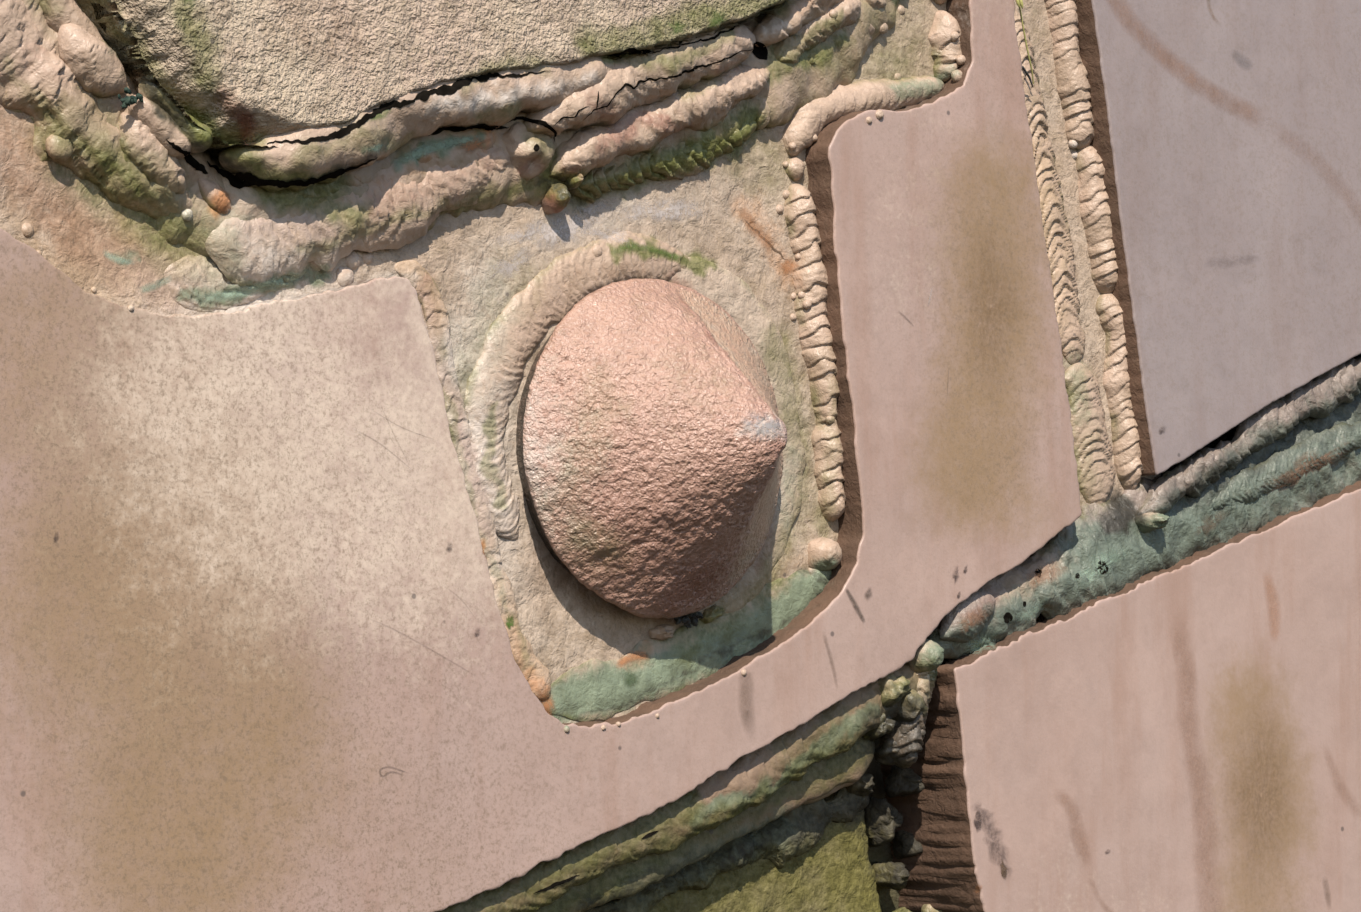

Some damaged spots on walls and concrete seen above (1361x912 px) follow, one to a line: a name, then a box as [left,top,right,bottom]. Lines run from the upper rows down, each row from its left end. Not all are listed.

crack [166,13,775,189]